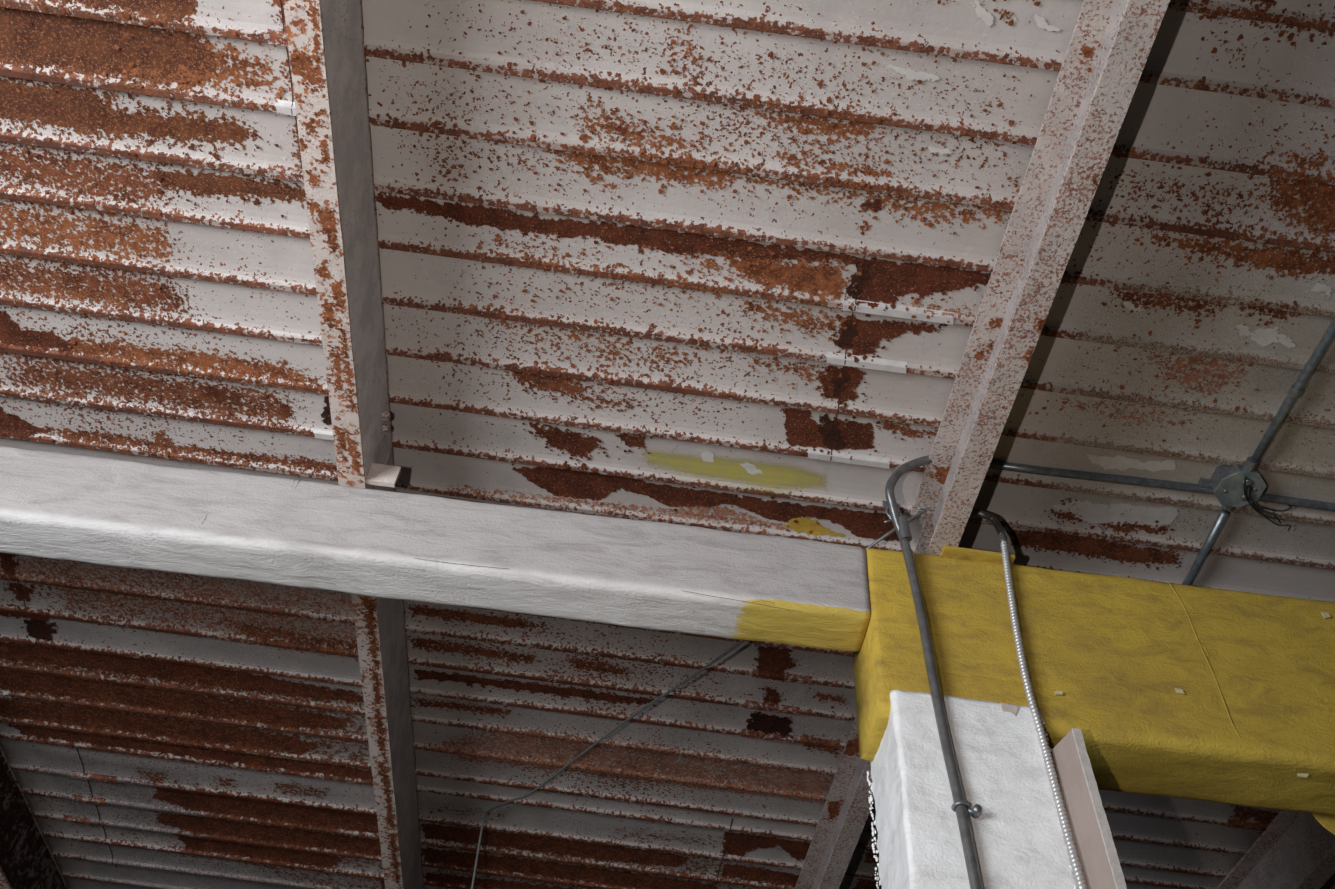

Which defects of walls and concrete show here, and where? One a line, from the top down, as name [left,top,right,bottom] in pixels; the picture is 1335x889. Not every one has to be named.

corrosion [1078,39,1101,72]
corrosion [1174,0,1335,85]
corrosion [0,0,363,479]
corrosion [366,0,1033,460]
corrosion [1035,134,1335,447]
corrosion [447,422,899,541]
corrosion [928,464,951,489]
corrosion [1006,497,1185,570]
corrosion [0,553,403,889]
corrosion [404,602,859,823]
corrosion [419,798,811,889]
corrosion [852,849,882,889]